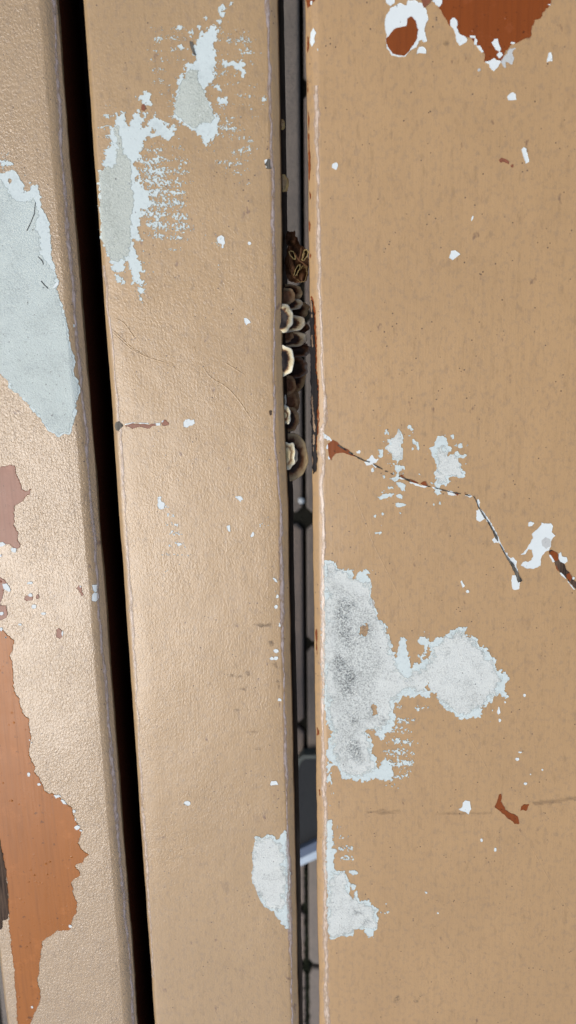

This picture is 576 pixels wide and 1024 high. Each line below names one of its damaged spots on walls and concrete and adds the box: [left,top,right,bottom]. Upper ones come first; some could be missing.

peeling [385,0,551,72]
peeling [97,1,267,303]
peeling [0,153,80,437]
peeling [0,465,31,557]
peeling [373,425,467,535]
crack [323,432,522,590]
peeling [521,521,555,569]
crack [549,550,576,590]
peeling [315,560,510,806]
peeling [0,578,88,1024]
peeling [251,830,291,929]
peeling [324,819,389,940]